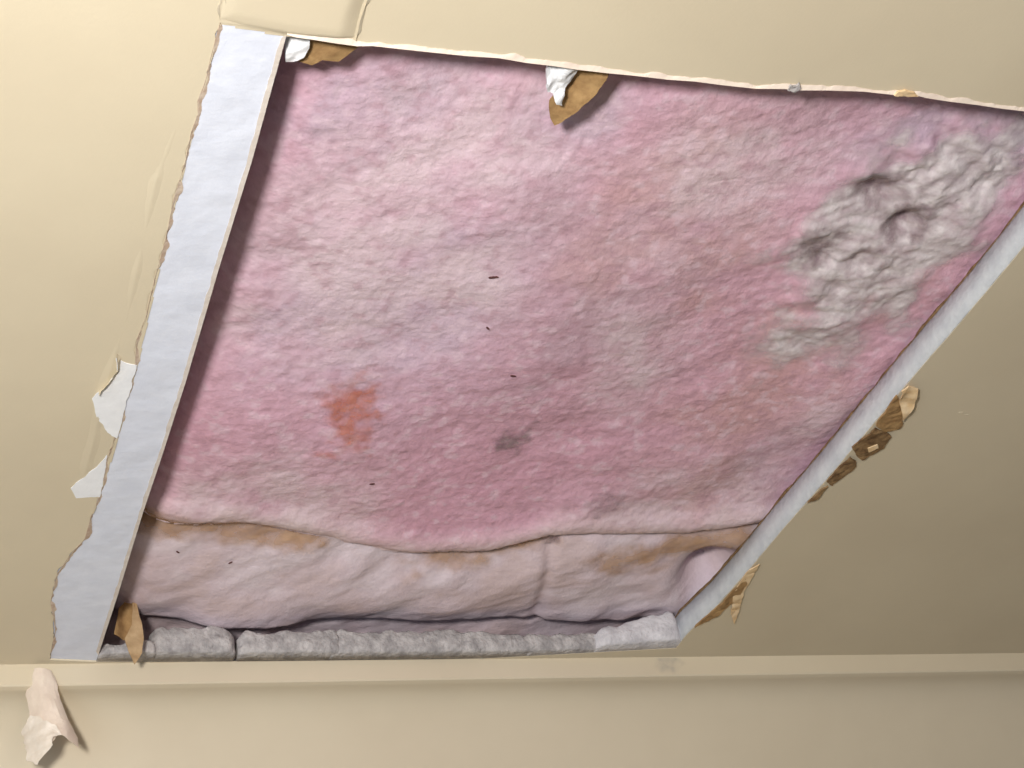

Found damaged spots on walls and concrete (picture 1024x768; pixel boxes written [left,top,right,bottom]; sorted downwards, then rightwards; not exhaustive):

peeling [894,89,918,97]
peeling [50,23,681,662]
peeling [21,668,79,765]